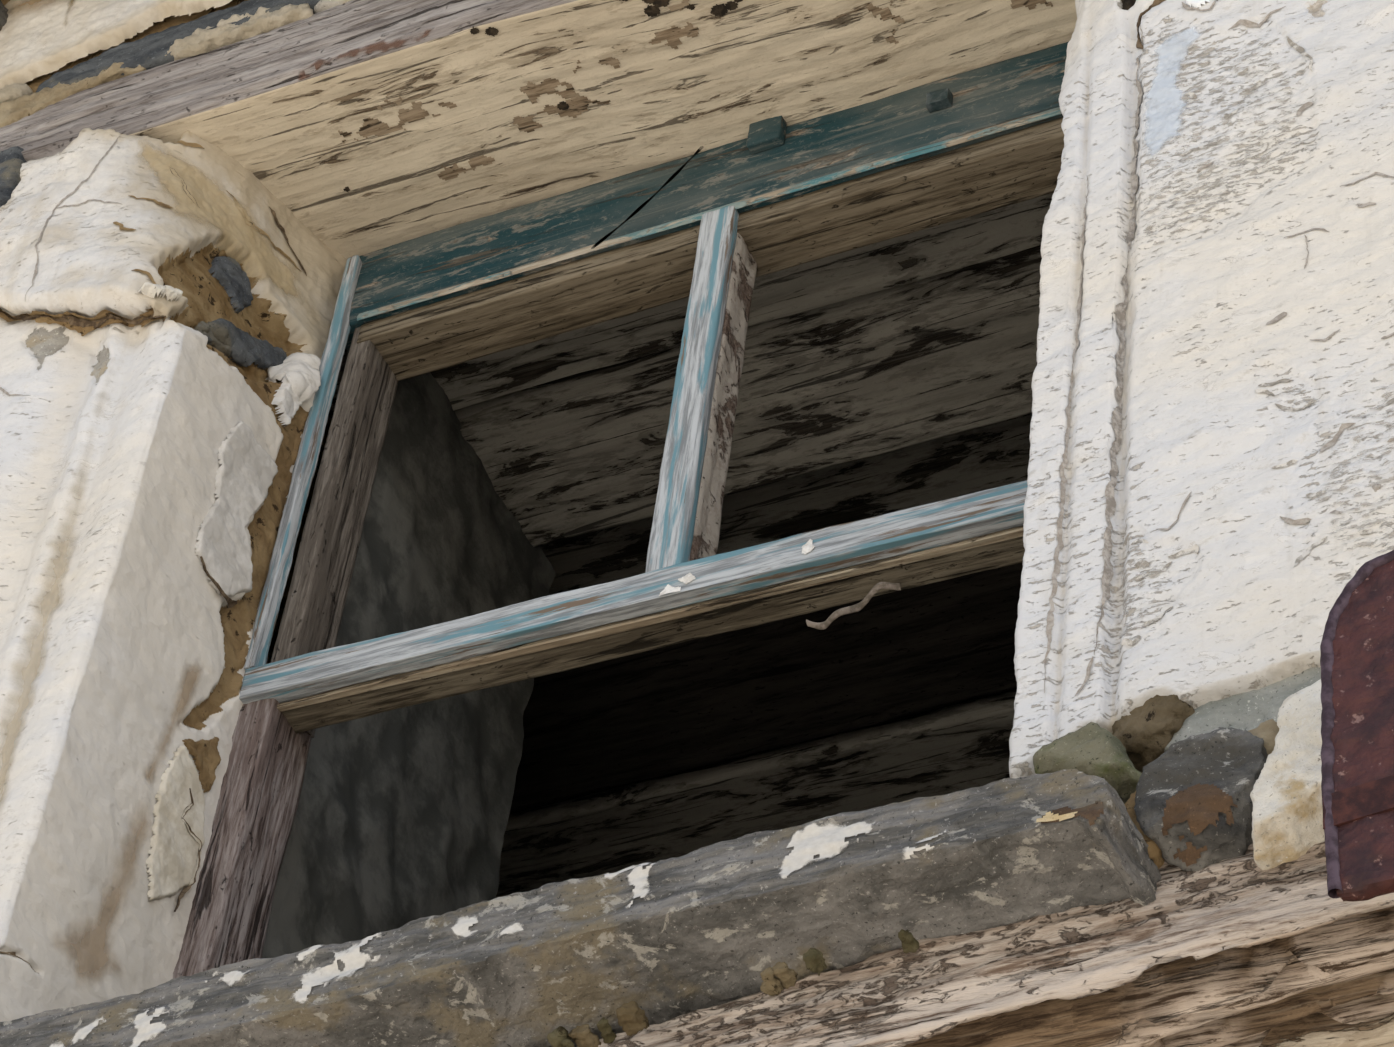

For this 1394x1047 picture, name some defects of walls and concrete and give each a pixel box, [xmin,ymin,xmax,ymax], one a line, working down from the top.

spalling [1117,0,1136,10]
crack [0,138,166,336]
spalling [138,242,321,912]
crack [0,951,37,973]